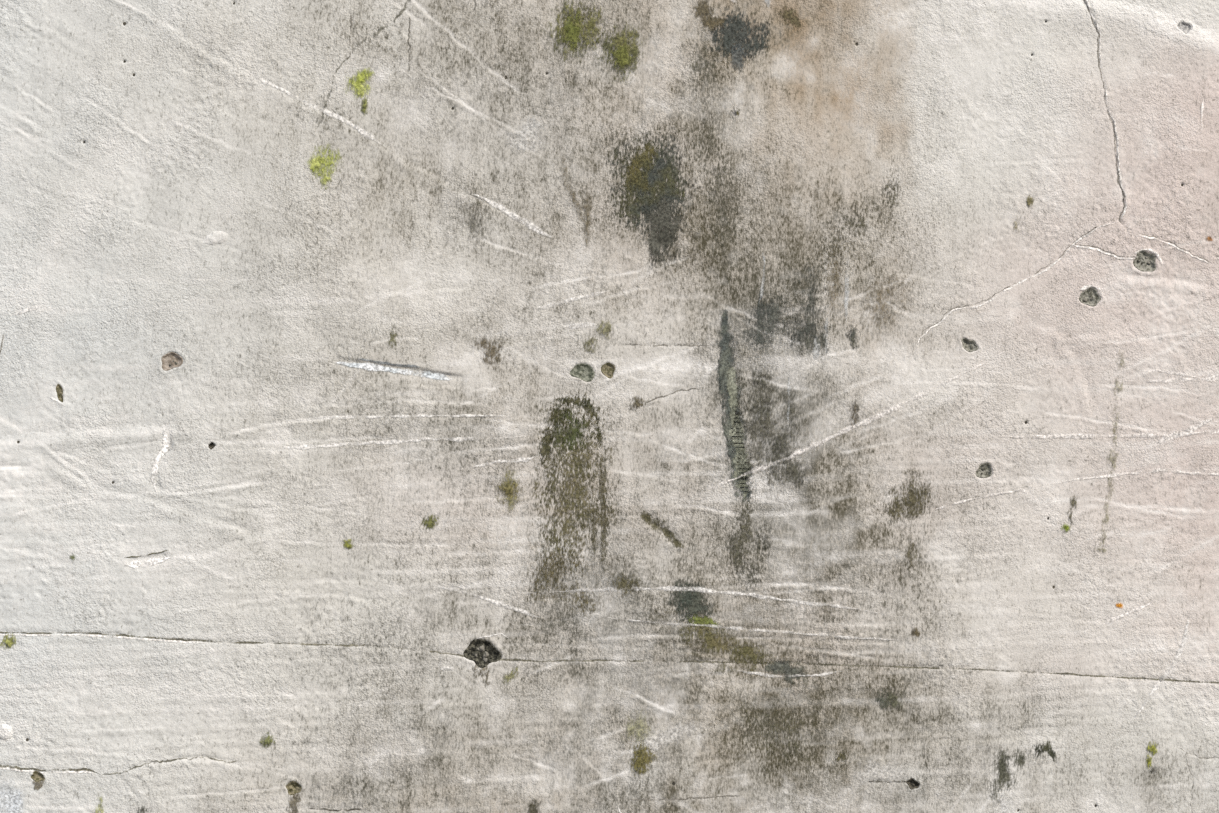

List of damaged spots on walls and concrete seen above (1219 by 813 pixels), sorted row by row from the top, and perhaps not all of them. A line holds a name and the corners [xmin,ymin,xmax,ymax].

crack [912,0,1219,353]
damp [564,168,592,244]
damp [592,459,609,569]
crack [0,632,364,647]
spalling [463,634,503,685]
crack [499,656,644,664]
crack [680,658,771,666]
crack [809,663,1219,683]